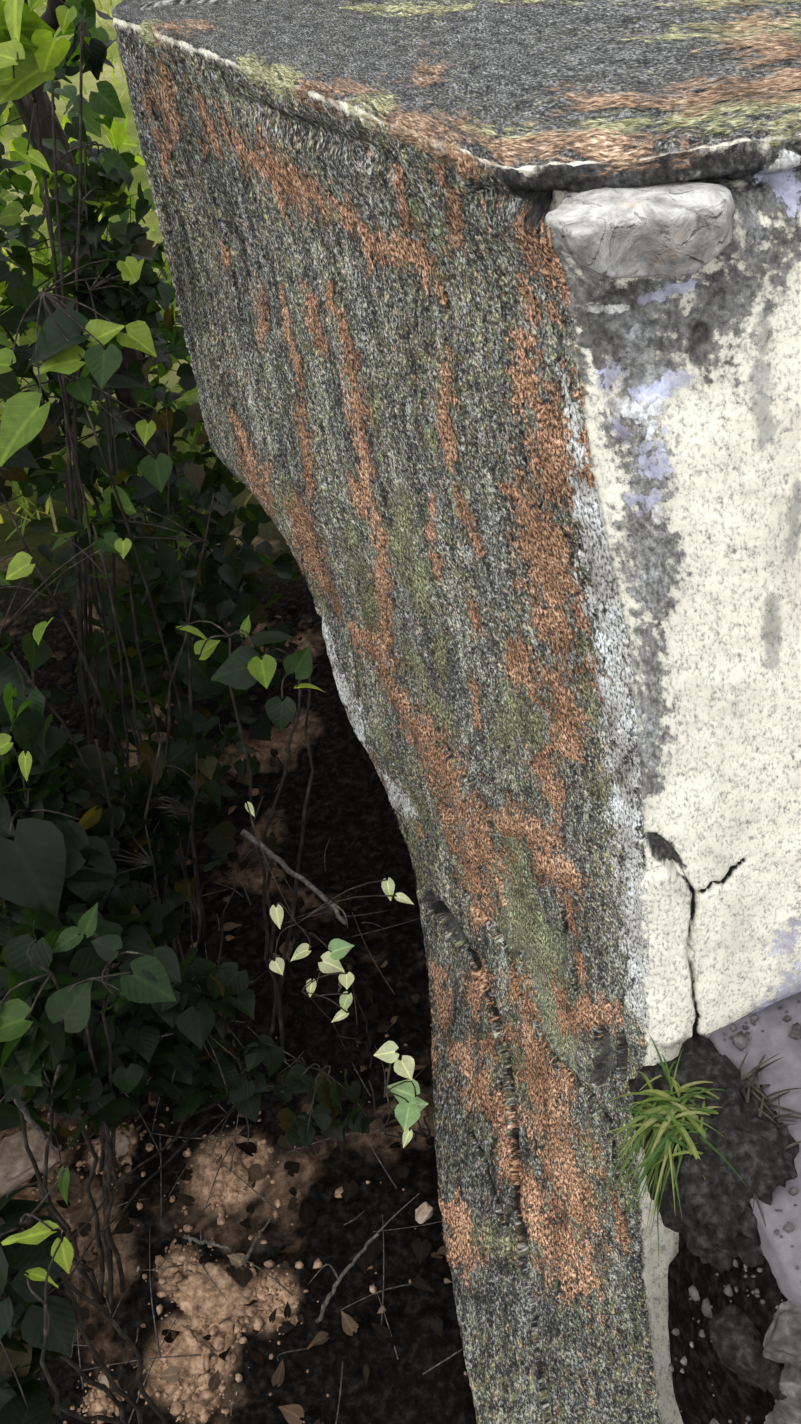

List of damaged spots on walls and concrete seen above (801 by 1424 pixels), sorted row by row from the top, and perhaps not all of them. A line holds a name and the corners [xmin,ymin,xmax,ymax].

leakage [535,135,801,800]
crack [673,858,745,1035]